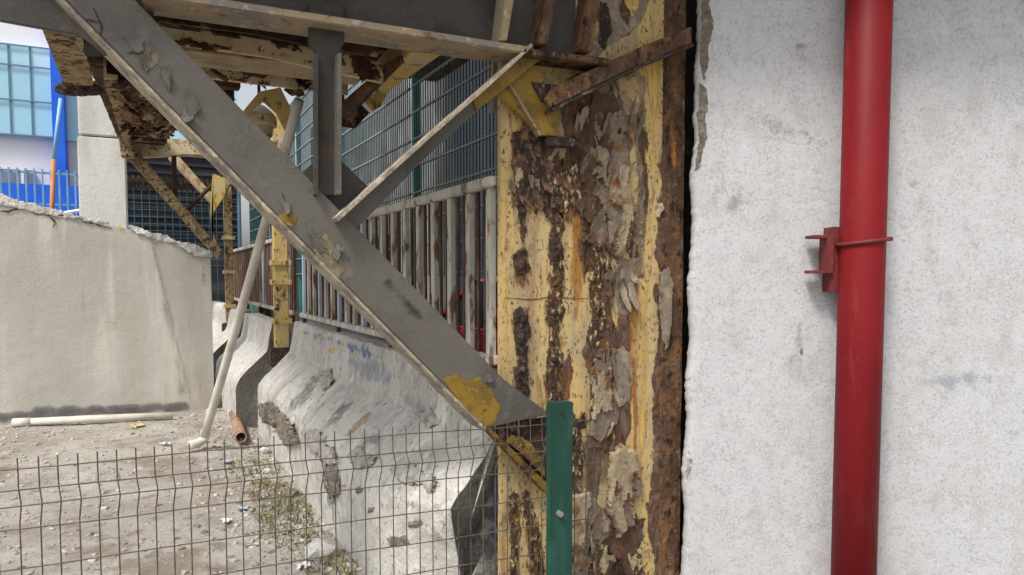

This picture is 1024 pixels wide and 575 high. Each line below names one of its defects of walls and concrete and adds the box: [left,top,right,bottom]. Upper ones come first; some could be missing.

spalling [694,0,713,171]
spalling [0,194,109,224]
spalling [128,225,213,258]
corrosion [509,127,583,403]
peeling [561,61,673,575]
corrosion [572,138,677,575]
damp [0,403,188,421]
spalling [258,401,377,499]
corrosion [506,488,545,575]